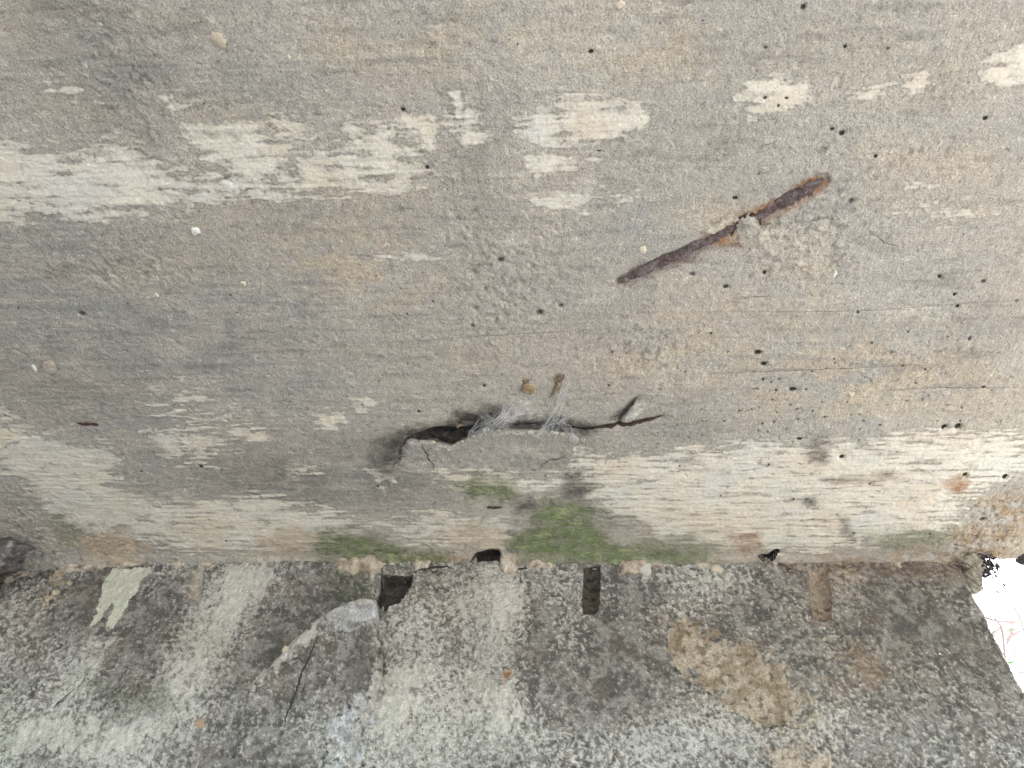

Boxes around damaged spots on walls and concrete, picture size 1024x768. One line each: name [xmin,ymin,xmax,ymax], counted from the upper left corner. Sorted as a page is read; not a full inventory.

crack [393,397,660,475]
crack [284,640,317,726]